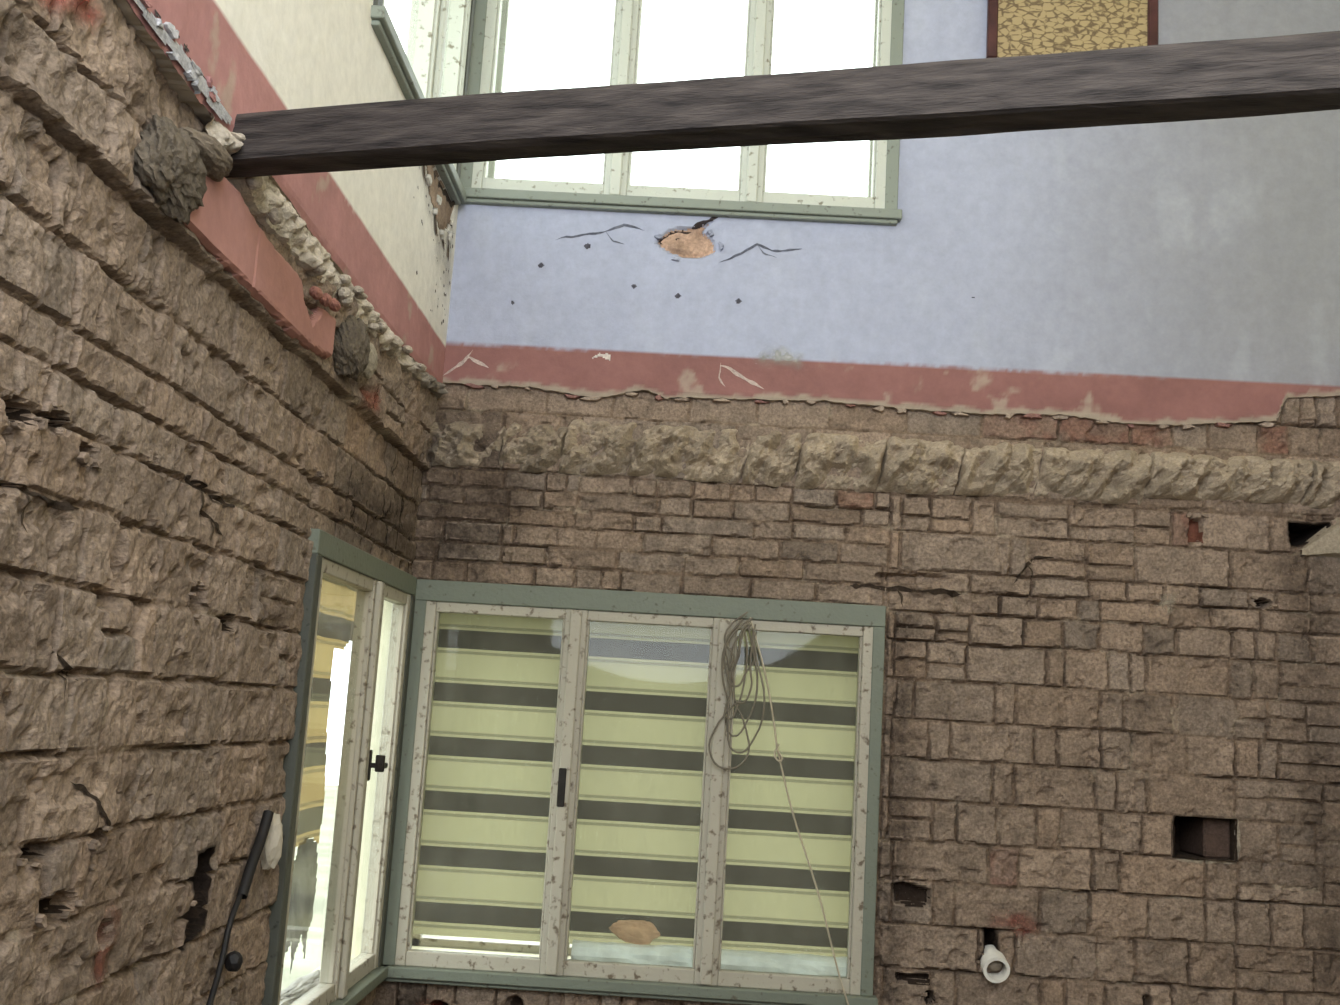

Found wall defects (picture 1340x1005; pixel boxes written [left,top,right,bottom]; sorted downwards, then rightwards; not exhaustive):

peeling [134,0,246,156]
flaking render [419,165,455,261]
crack [556,224,642,244]
flaking render [654,217,724,261]
crack [721,243,799,262]
flaking render [184,176,448,399]
spalling [5,400,70,435]
flaking render [564,394,604,402]